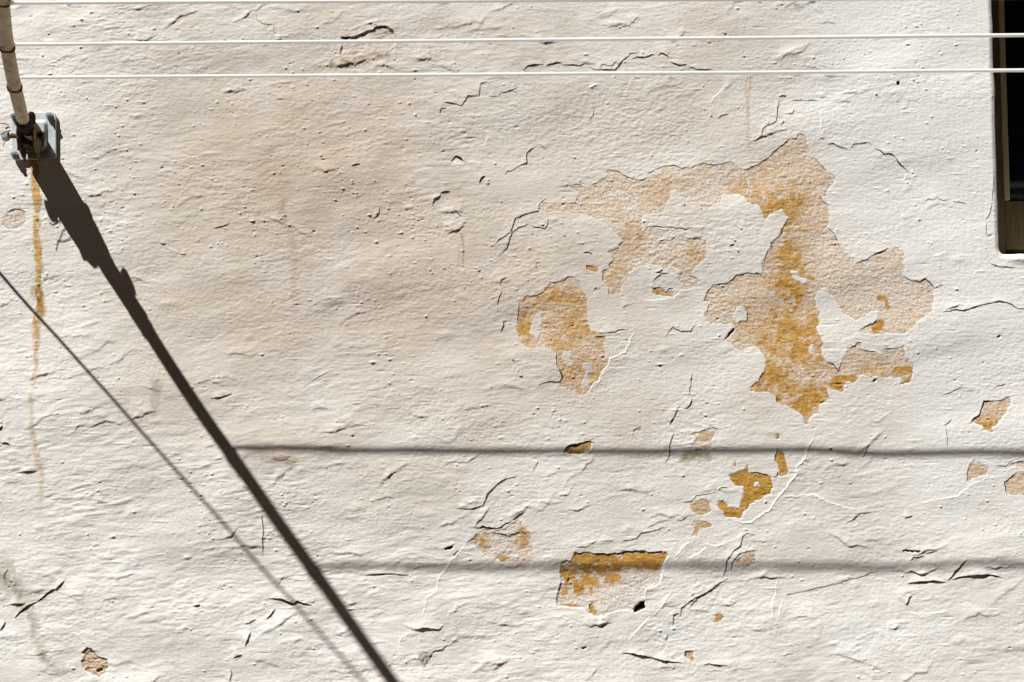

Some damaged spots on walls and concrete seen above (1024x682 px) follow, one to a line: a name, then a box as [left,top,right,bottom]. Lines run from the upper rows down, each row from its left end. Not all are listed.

crack [439,52,728,117]
rust [30,160,45,360]
crack [494,199,592,331]
peeling [517,133,934,424]
crack [944,300,1024,312]
spalling [563,441,595,454]
peeling [971,397,1011,432]
peeling [687,434,788,536]
crack [0,571,65,630]
spalling [553,550,668,616]
crack [906,550,999,616]
spalling [82,647,109,677]